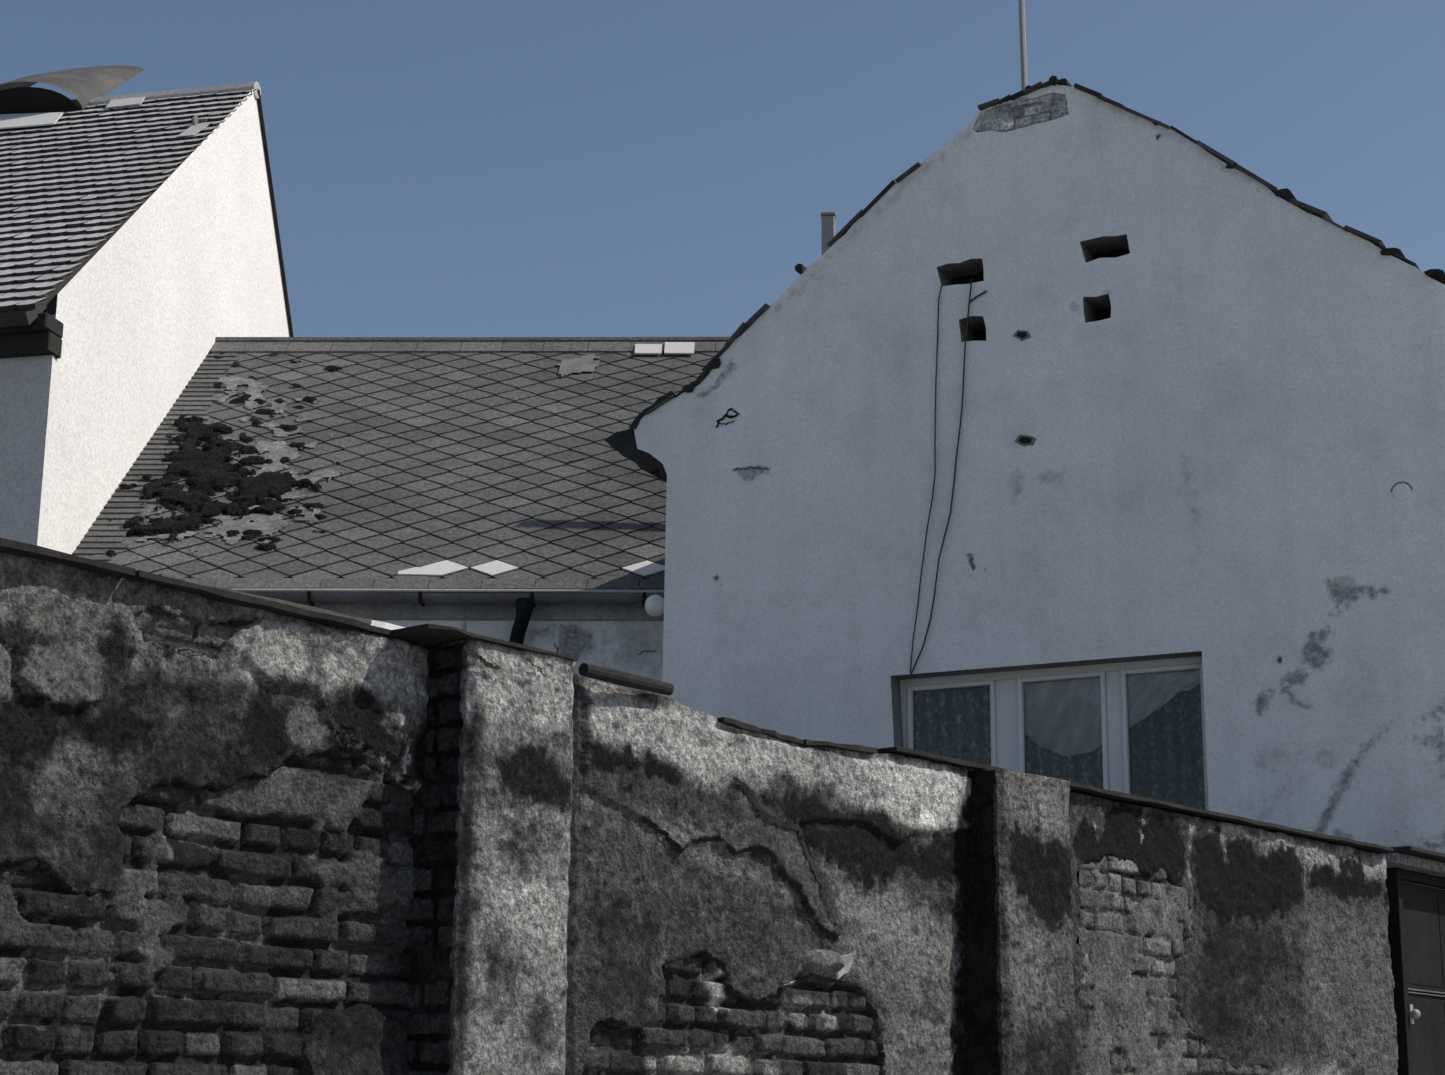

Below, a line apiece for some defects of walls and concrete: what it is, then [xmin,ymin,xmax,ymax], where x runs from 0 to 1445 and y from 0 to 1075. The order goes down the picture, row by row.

flaking render [972,92,1068,132]
peeling [0,644,103,707]
water stain [337,684,427,793]
water stain [591,742,683,784]
flaking render [0,696,415,1075]
crack [598,1017,647,1028]
flaking render [582,954,880,1075]
crack [641,777,840,941]
crack [667,951,886,1075]
water stain [764,791,973,1075]
peeling [1077,855,1268,1075]
water stain [1005,802,1389,1045]